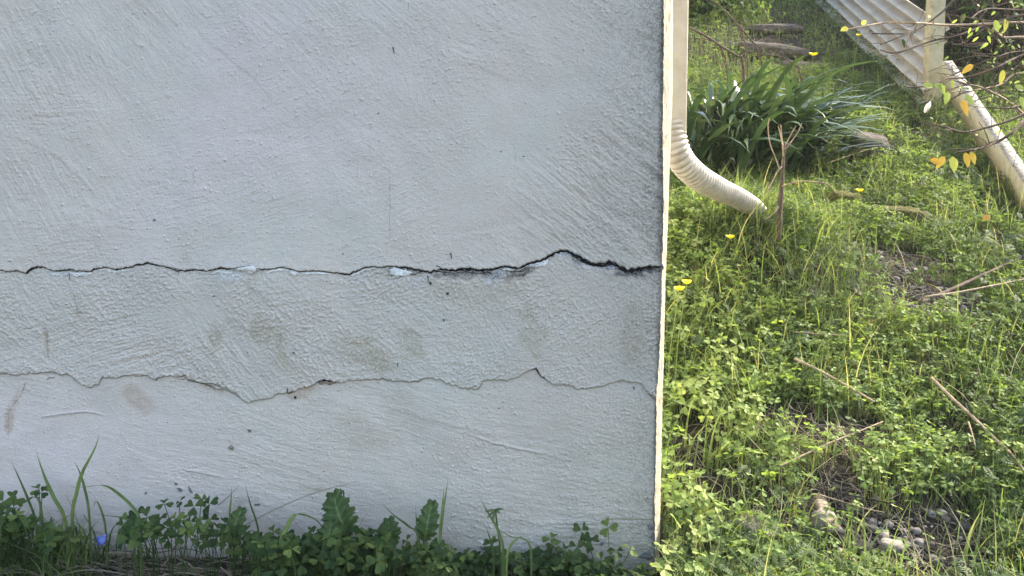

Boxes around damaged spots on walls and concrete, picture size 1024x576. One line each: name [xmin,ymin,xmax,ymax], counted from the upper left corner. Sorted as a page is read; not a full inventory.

crack [0,250,660,310]